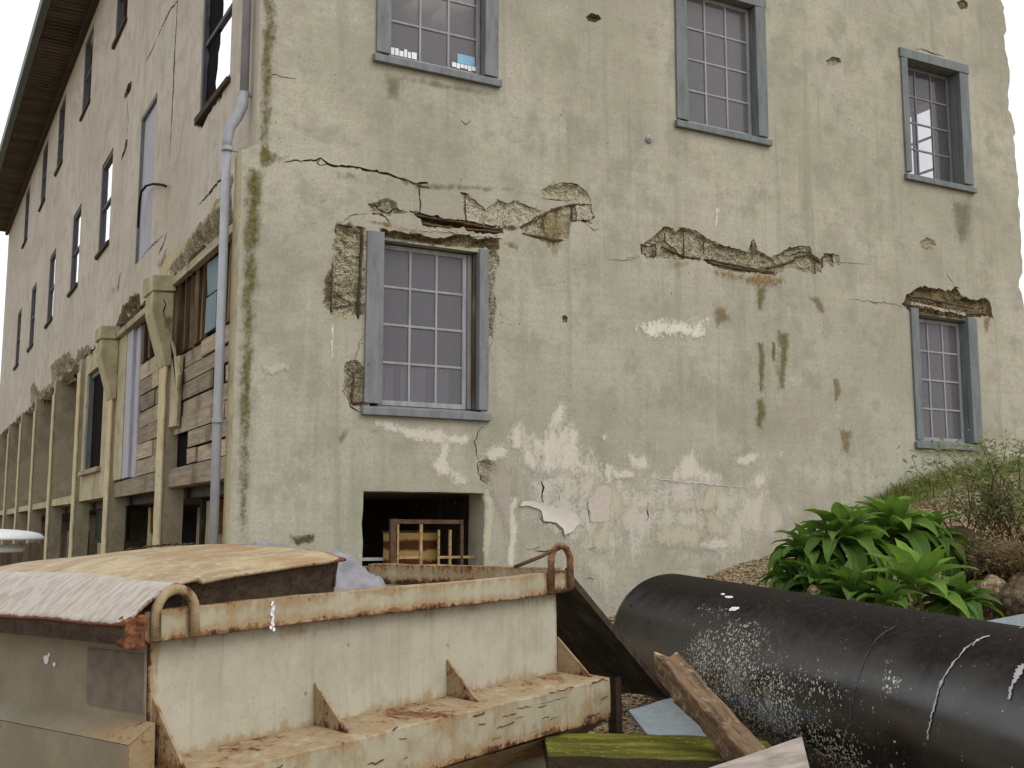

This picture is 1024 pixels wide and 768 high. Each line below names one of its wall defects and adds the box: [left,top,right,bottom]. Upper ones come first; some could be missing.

crack [286,157,428,184]
spalling [161,174,234,275]
spalling [323,182,595,354]
spalling [628,226,841,277]
water stain [635,308,727,341]
spalling [902,285,993,330]
spalling [30,345,93,410]
spalling [343,338,368,412]
water stain [758,332,789,428]
peeling [477,457,499,561]
peeling [507,485,612,566]
peeling [744,498,788,553]